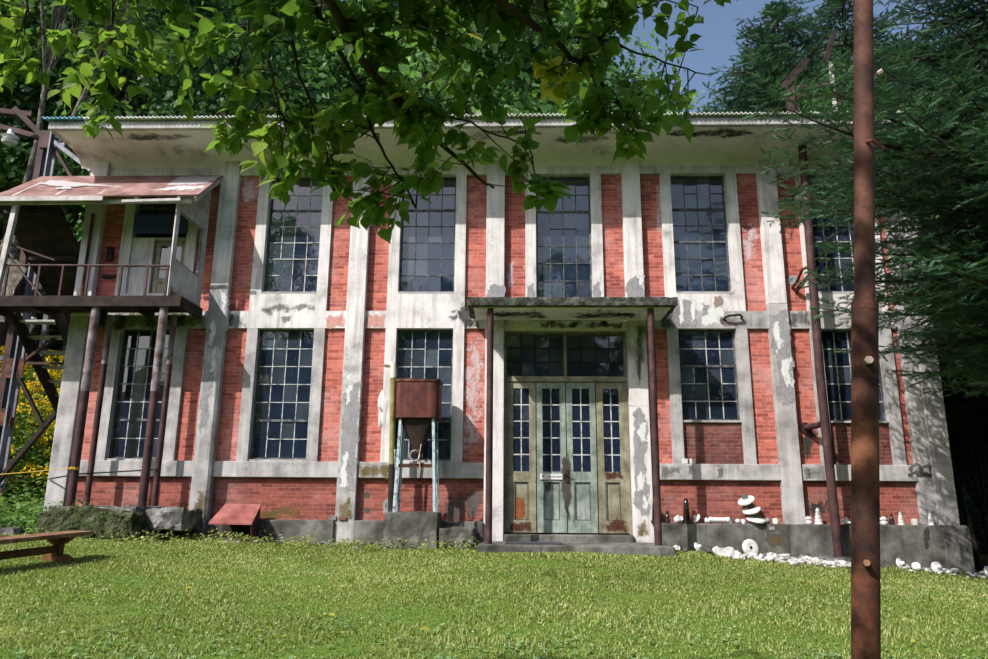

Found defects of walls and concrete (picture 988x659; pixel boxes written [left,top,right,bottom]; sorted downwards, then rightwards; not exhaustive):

peeling [207,284,231,349]
leakage [449,306,646,447]
peeling [662,299,709,329]
peeling [769,309,795,405]
peeling [337,372,370,513]
peeling [633,408,651,516]
corrosion [510,499,531,531]